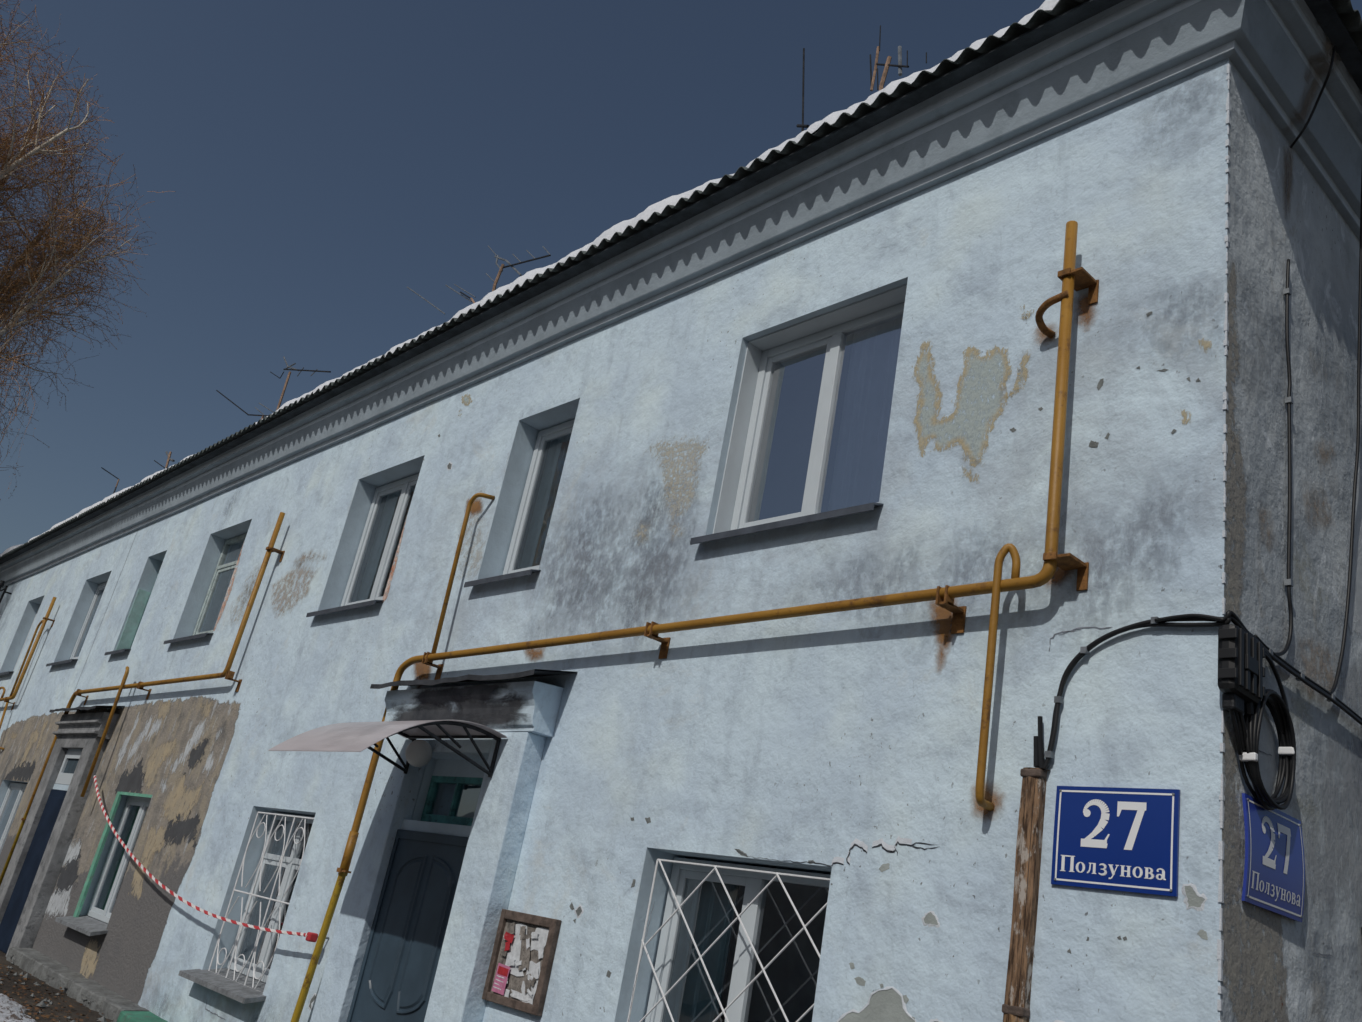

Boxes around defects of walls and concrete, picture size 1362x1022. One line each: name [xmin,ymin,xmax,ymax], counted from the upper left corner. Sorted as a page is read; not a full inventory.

peeling [912,342,1030,481]
peeling [272,555,314,612]
corrosion [933,604,955,663]
water stain [451,694,524,721]
peeling [0,696,241,1004]
crack [737,836,940,866]
flaking render [1182,883,1207,911]
peeling [1197,716,1289,1022]
flaking render [837,963,943,1022]